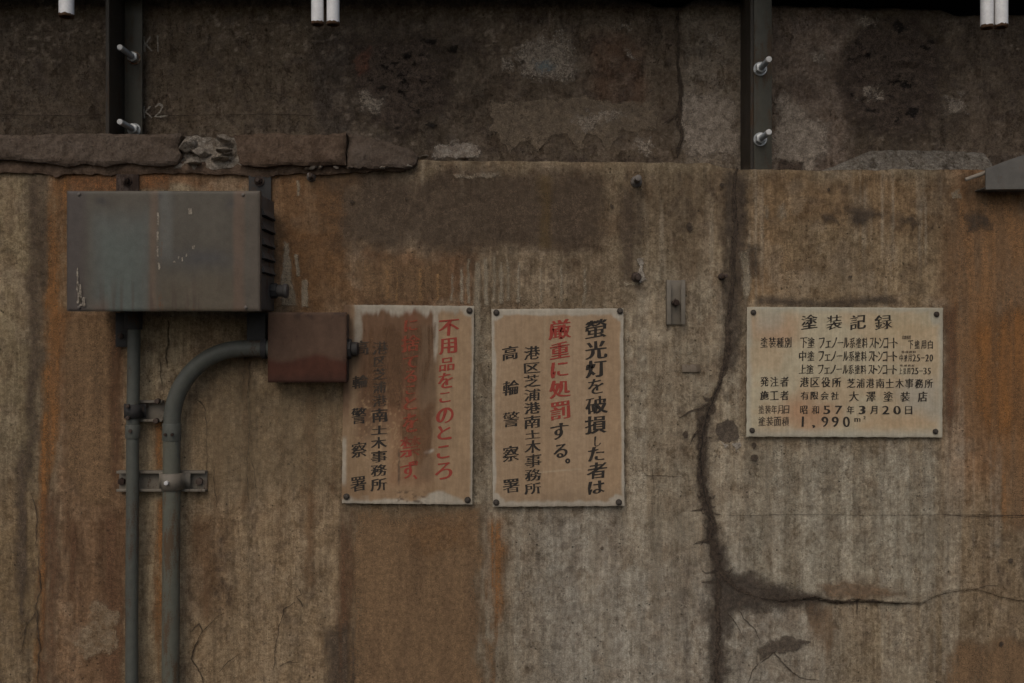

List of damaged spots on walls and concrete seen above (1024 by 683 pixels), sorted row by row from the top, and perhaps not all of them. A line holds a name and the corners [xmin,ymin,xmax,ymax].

efflorescence [432,139,481,160]
crack [663,12,688,158]
leakage [722,171,750,368]
corrosion [64,317,120,504]
crack [647,168,1024,683]
leakage [695,405,826,683]